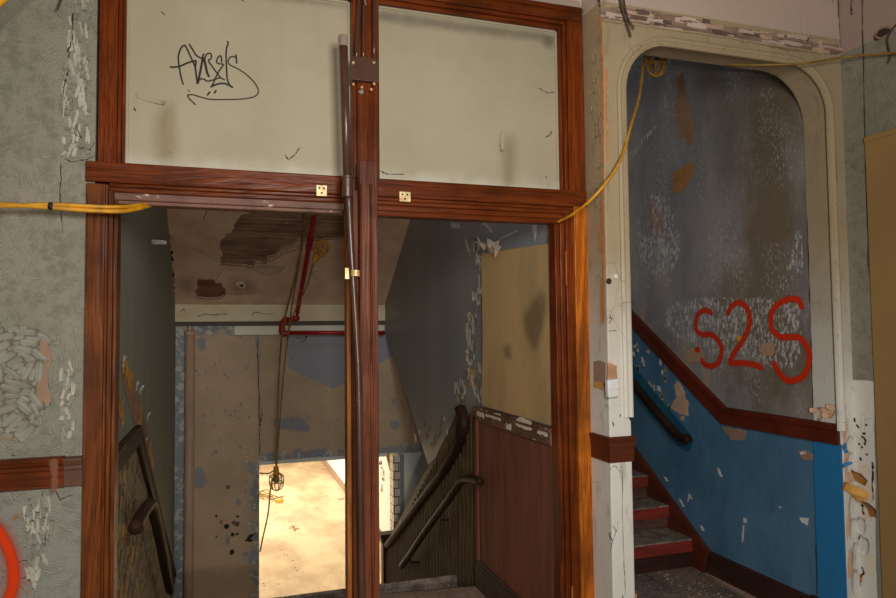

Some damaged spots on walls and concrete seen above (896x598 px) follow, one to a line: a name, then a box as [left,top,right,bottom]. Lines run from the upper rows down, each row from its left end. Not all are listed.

peeling [59,0,98,203]
spalling [591,7,842,278]
flaking render [194,279,226,300]
flaking render [219,210,344,267]
peeling [454,236,501,405]
peeling [648,359,689,421]
peeling [809,404,836,421]
peeling [842,380,878,598]